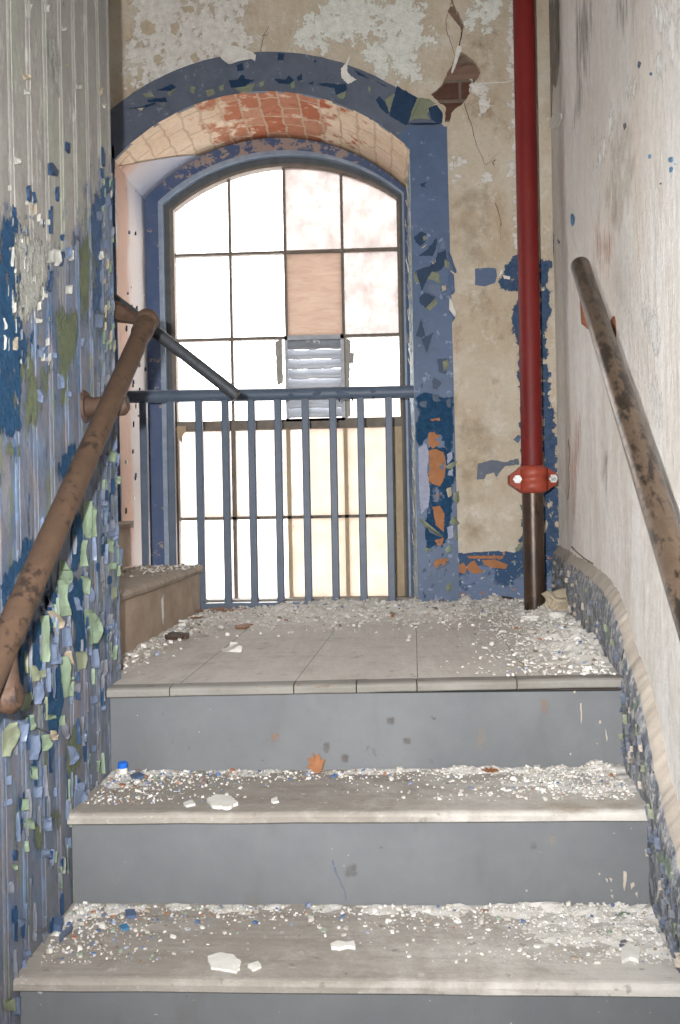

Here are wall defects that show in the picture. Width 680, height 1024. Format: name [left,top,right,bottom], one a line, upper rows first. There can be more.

peeling [25,3,50,18]
peeling [122,0,480,125]
crack [464,103,496,165]
peeling [549,0,560,117]
peeling [0,147,128,469]
peeling [405,219,523,599]
peeling [539,230,560,473]
peeling [543,486,619,664]
peeling [2,416,137,978]